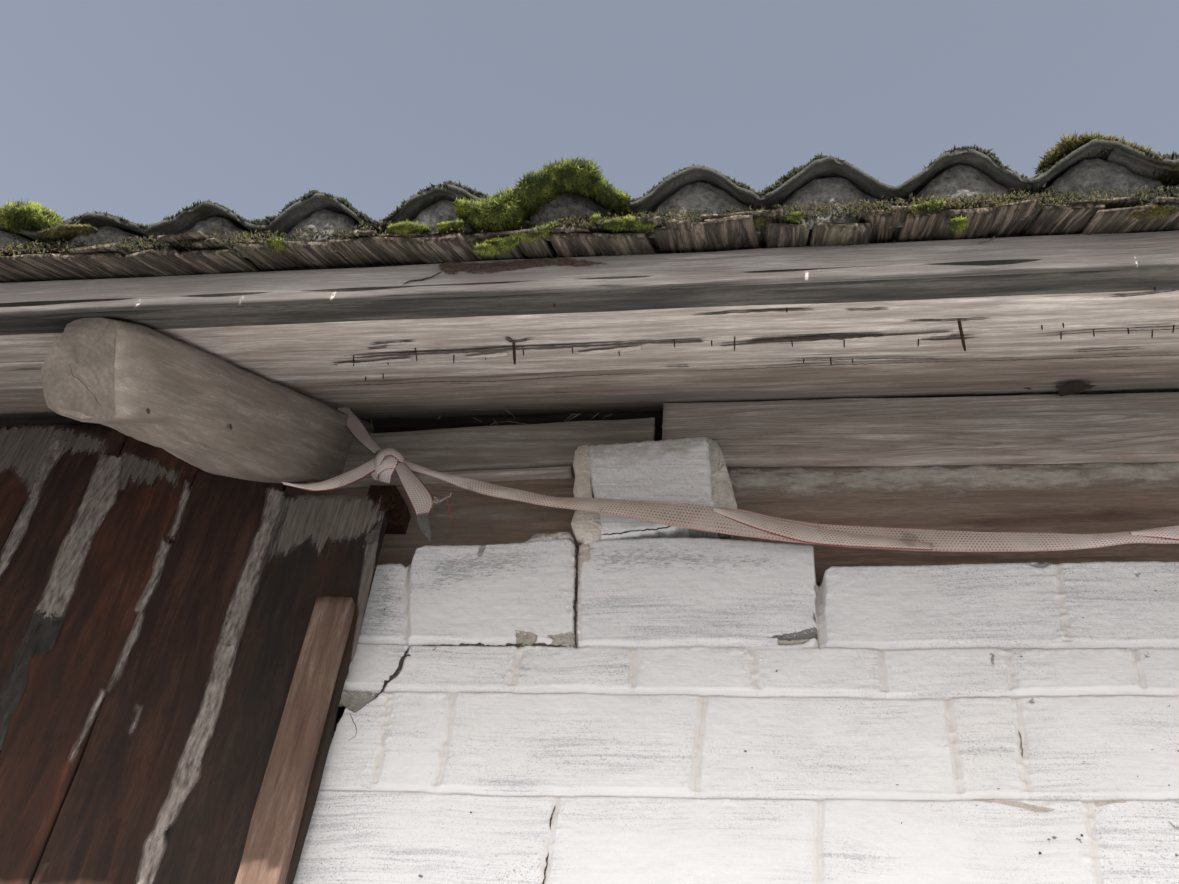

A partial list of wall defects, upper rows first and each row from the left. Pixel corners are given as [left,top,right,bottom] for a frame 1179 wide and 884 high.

crack [375,526,671,698]
crack [542,807,555,884]